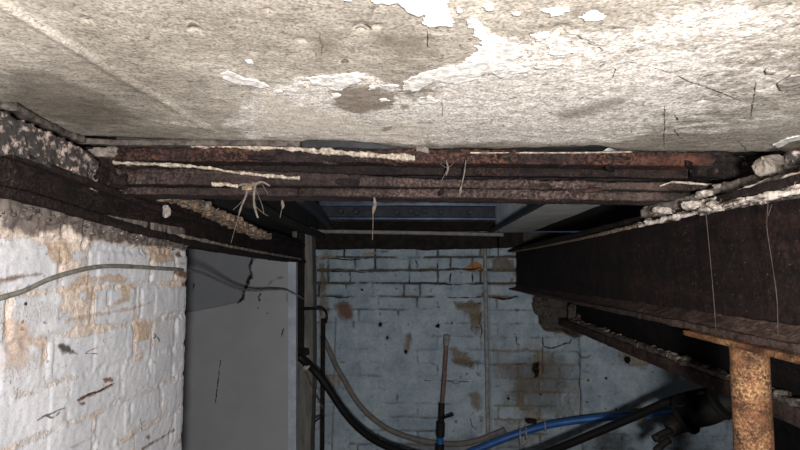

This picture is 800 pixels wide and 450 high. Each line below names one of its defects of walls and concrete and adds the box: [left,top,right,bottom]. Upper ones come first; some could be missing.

peeling [578,10,606,22]
peeling [298,0,574,113]
peeling [220,70,284,94]
crack [612,62,756,116]
peeling [765,69,800,91]
leakage [244,92,436,142]
rust [605,155,631,172]
rust [120,187,694,206]
spalling [47,242,71,265]
peeling [409,171,800,319]
spalling [71,274,149,312]